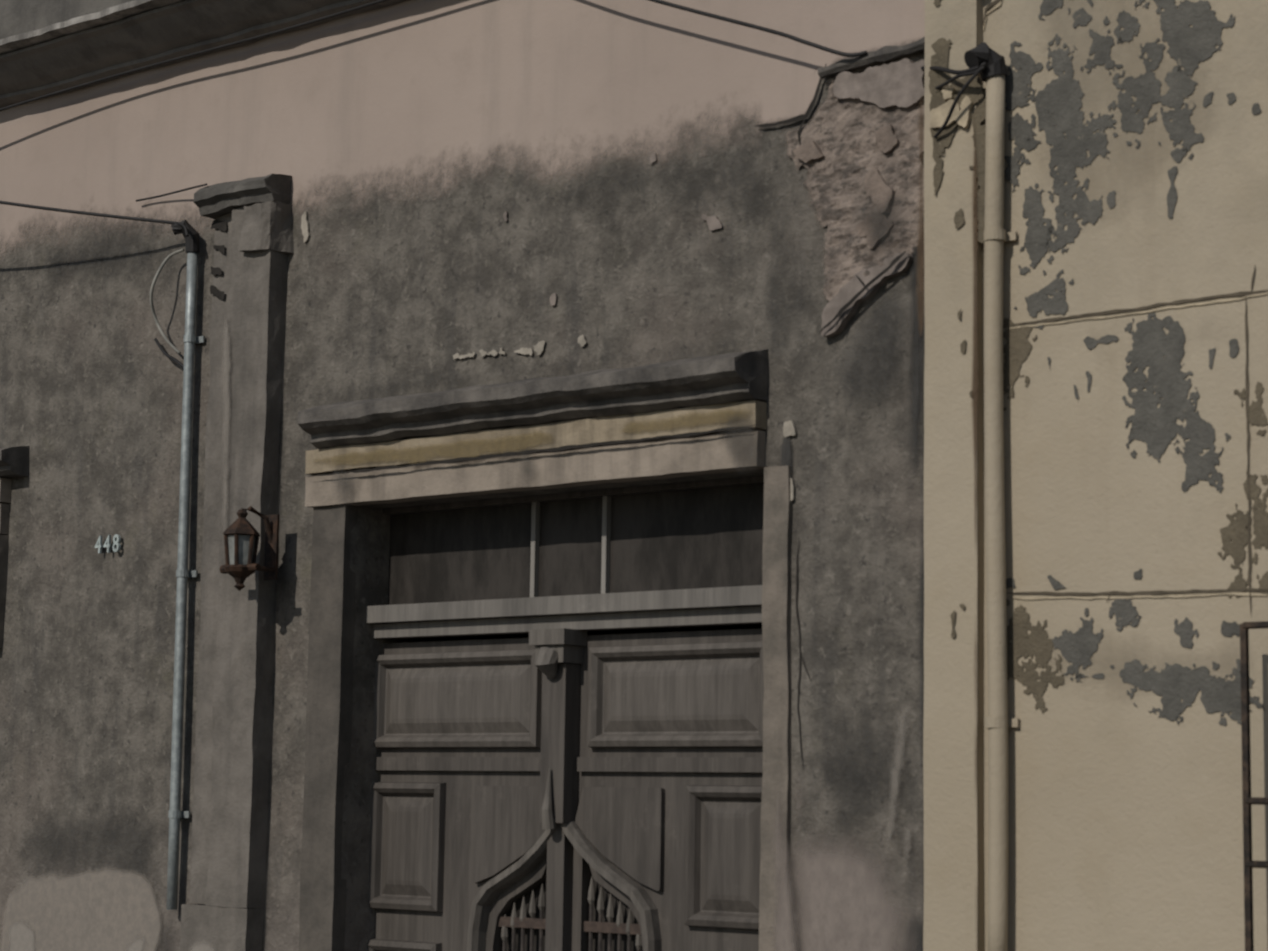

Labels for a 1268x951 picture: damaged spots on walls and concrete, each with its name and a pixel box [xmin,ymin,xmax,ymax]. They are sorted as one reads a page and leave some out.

spalling [785,37,986,338]
peeling [1003,0,1239,411]
leakage [0,446,30,479]
spalling [453,340,546,360]
leakage [297,349,769,464]
leakage [911,247,923,463]
peeling [1083,313,1231,492]
peeling [1234,382,1268,436]
peeling [950,604,965,639]
peeling [1047,575,1066,590]
peeling [1006,578,1265,726]
peeling [1218,471,1268,598]